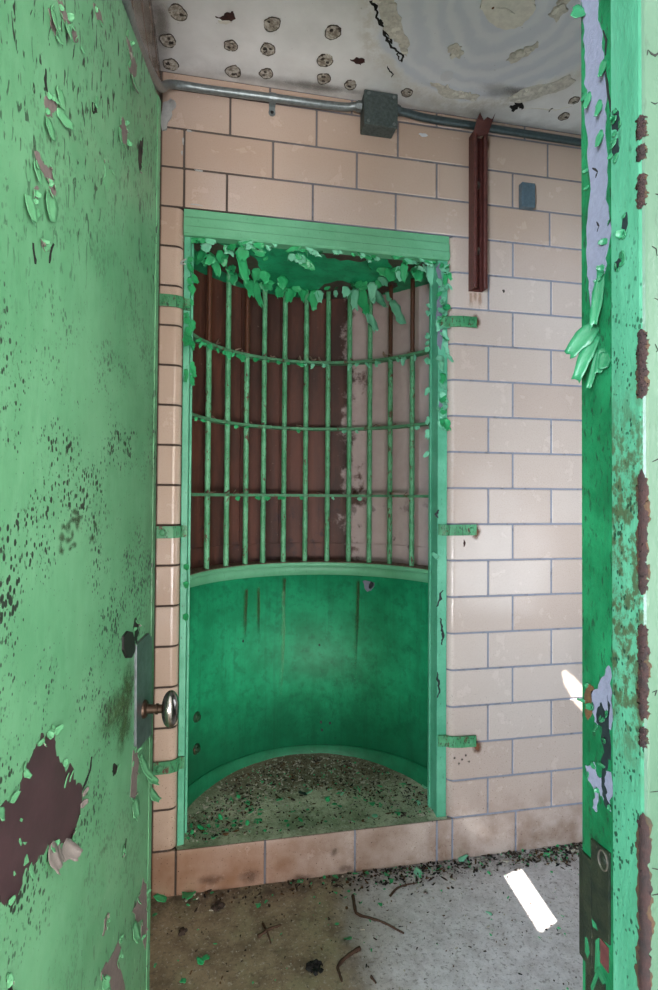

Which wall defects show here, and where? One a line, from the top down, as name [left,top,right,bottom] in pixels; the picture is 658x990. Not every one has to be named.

crack [369,1,404,77]
peeling [44,69,75,141]
peeling [25,150,59,223]
peeling [506,0,628,389]
corrosion [634,114,649,209]
corrosion [635,329,650,399]
leakage [60,510,81,553]
corrosion [635,469,651,595]
peeling [585,665,613,812]
peeling [0,724,92,907]
peeling [101,879,167,990]
corrosion [634,813,656,990]